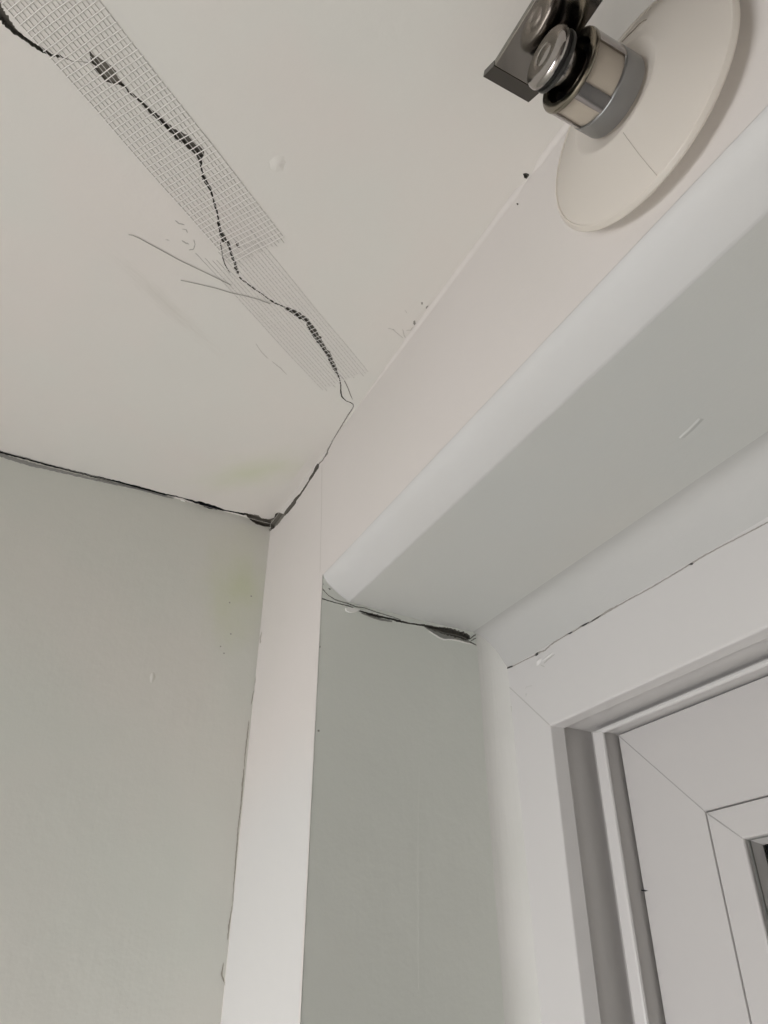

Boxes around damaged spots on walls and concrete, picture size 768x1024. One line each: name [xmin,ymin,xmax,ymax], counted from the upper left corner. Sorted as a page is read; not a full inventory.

crack [0,3,354,531]
crack [322,588,476,645]
crack [507,522,768,669]